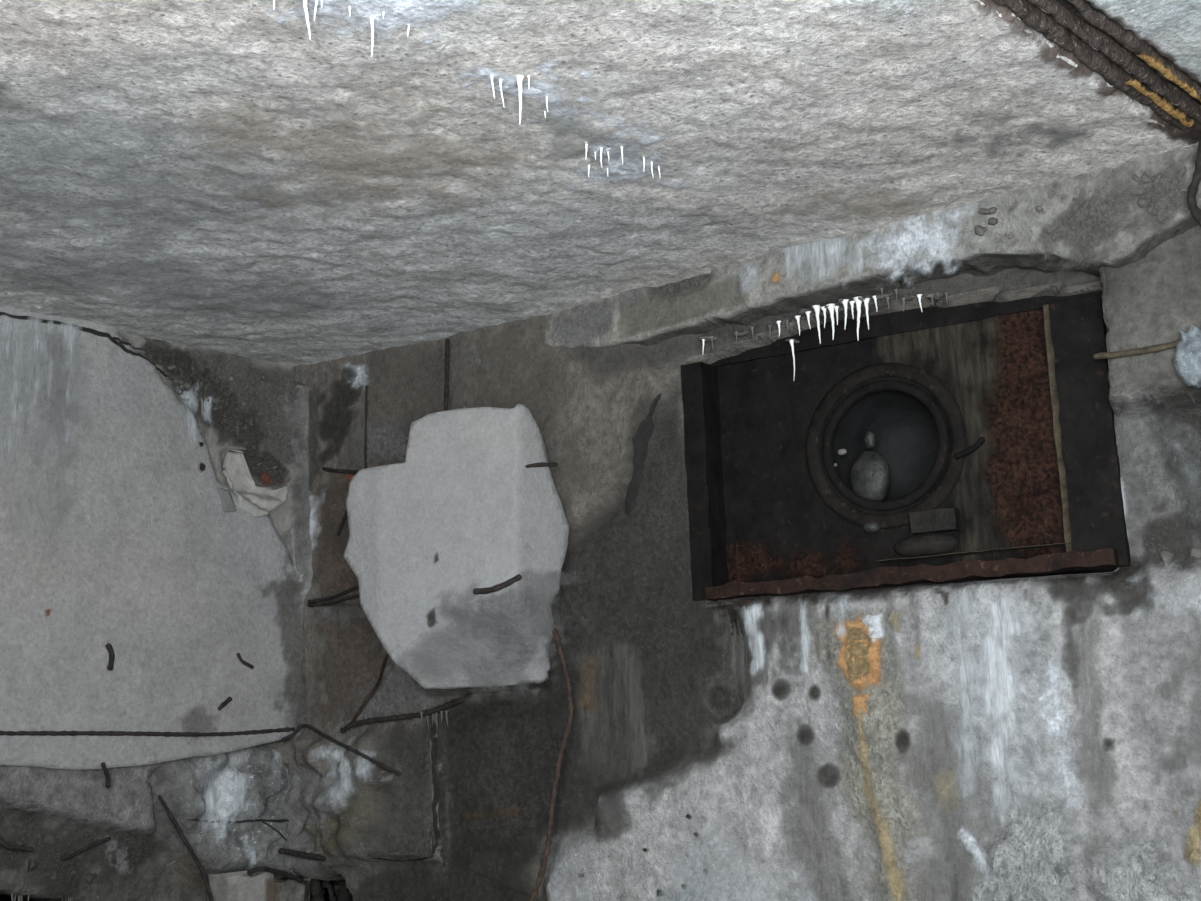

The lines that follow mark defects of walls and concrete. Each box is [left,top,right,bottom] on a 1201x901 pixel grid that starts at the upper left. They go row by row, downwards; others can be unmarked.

leakage [268,0,479,57]
leakage [459,63,678,189]
corrosion [977,0,1201,144]
crack [0,312,182,387]
leakage [585,211,1123,377]
spalling [322,386,368,474]
spalling [158,795,214,901]
leakage [798,725,844,901]
leakage [864,615,883,641]
corrosion [708,560,1145,901]
leakage [897,603,1021,901]
leakage [1039,561,1154,801]